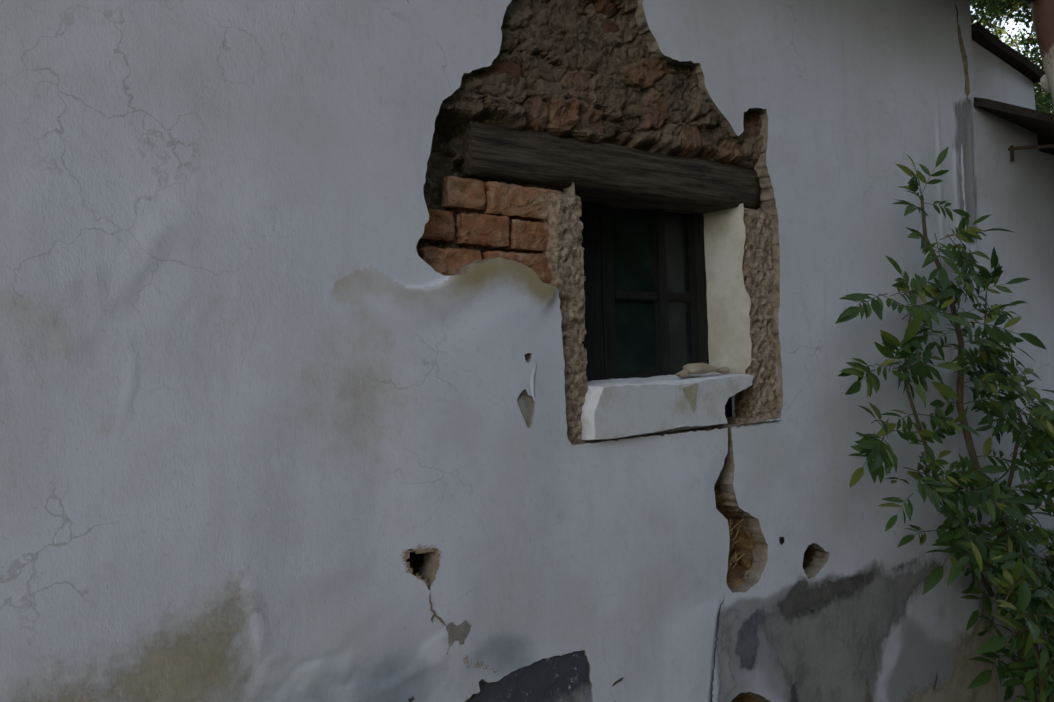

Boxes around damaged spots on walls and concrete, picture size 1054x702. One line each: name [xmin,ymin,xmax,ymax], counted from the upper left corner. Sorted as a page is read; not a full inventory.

spalling [416,0,764,444]
spalling [708,206,777,428]
flaking render [403,546,592,702]
spalling [731,692,763,702]
spalling [778,546,873,620]
water stain [763,560,939,702]
water stain [905,595,998,702]